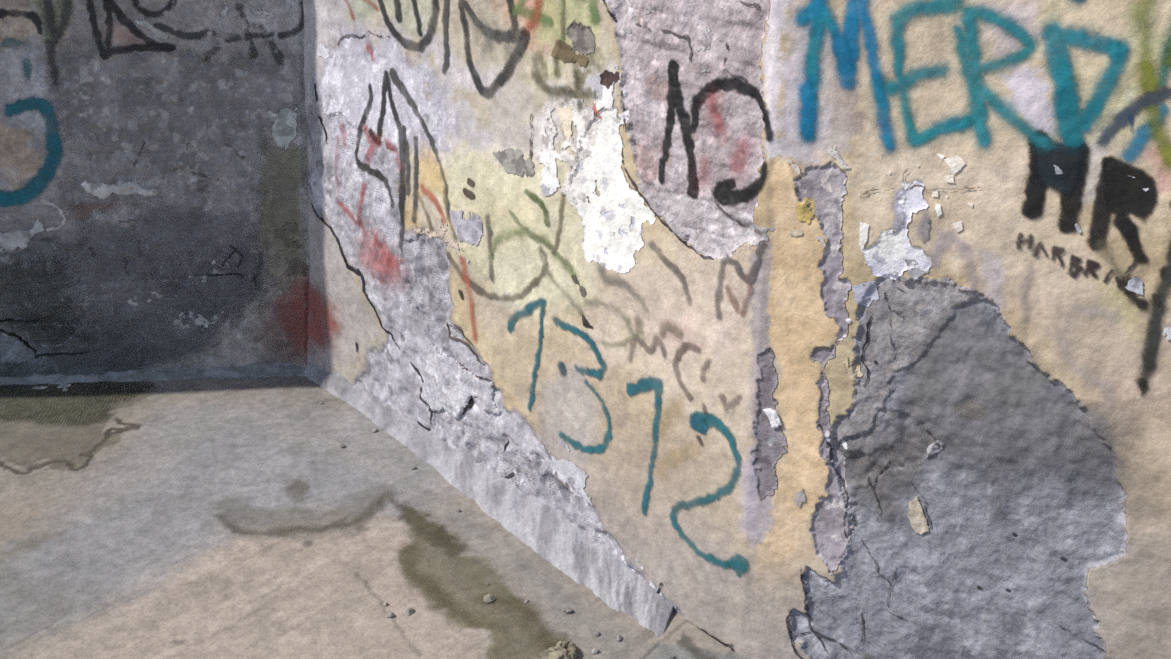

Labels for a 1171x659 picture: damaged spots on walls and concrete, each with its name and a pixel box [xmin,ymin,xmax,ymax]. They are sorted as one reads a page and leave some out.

spalling [493,0,774,273]
crack [0,318,87,358]
water stain [0,381,156,474]
spalling [0,20,681,616]
peeling [750,348,787,501]
spalling [787,145,1128,659]
peeling [1125,277,1143,295]
water stain [232,492,565,659]